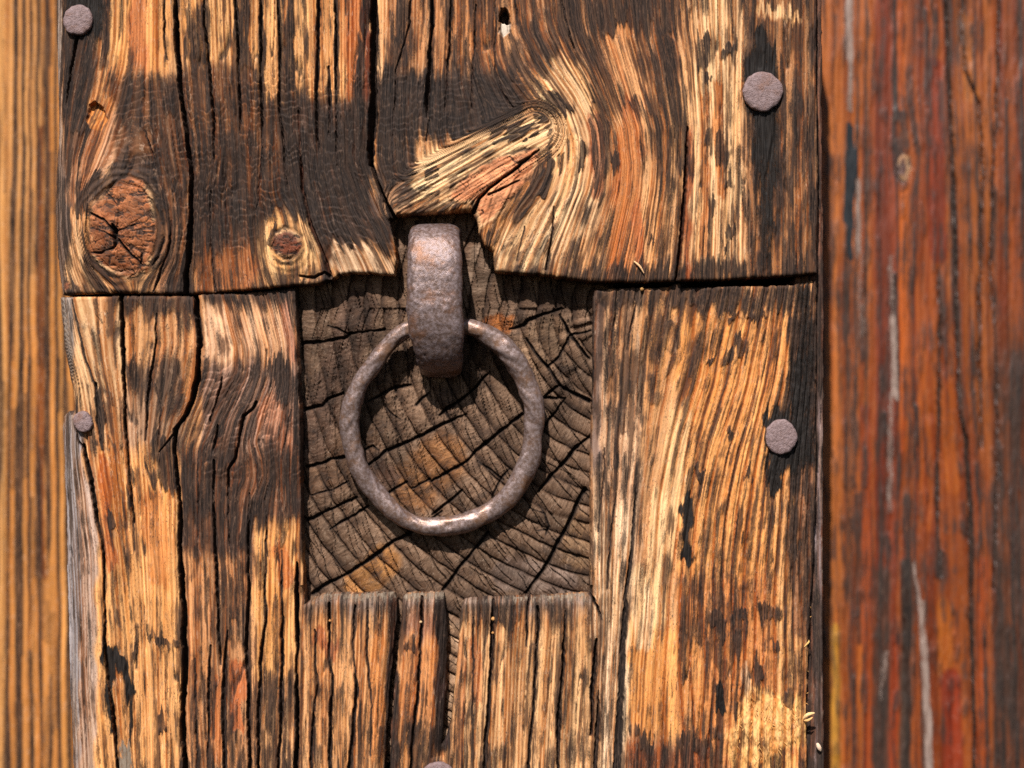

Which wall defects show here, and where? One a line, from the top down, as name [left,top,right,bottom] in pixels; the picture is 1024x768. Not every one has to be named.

crack [71,0,639,768]